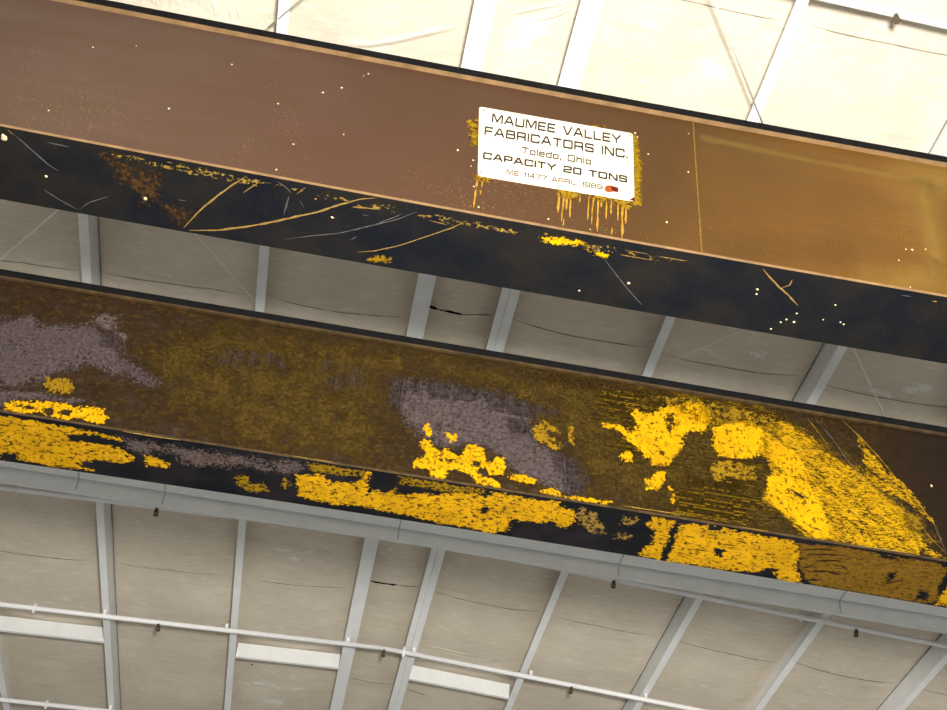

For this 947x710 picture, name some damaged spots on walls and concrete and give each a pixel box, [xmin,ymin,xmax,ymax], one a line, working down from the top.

peeling [0,313,947,607]